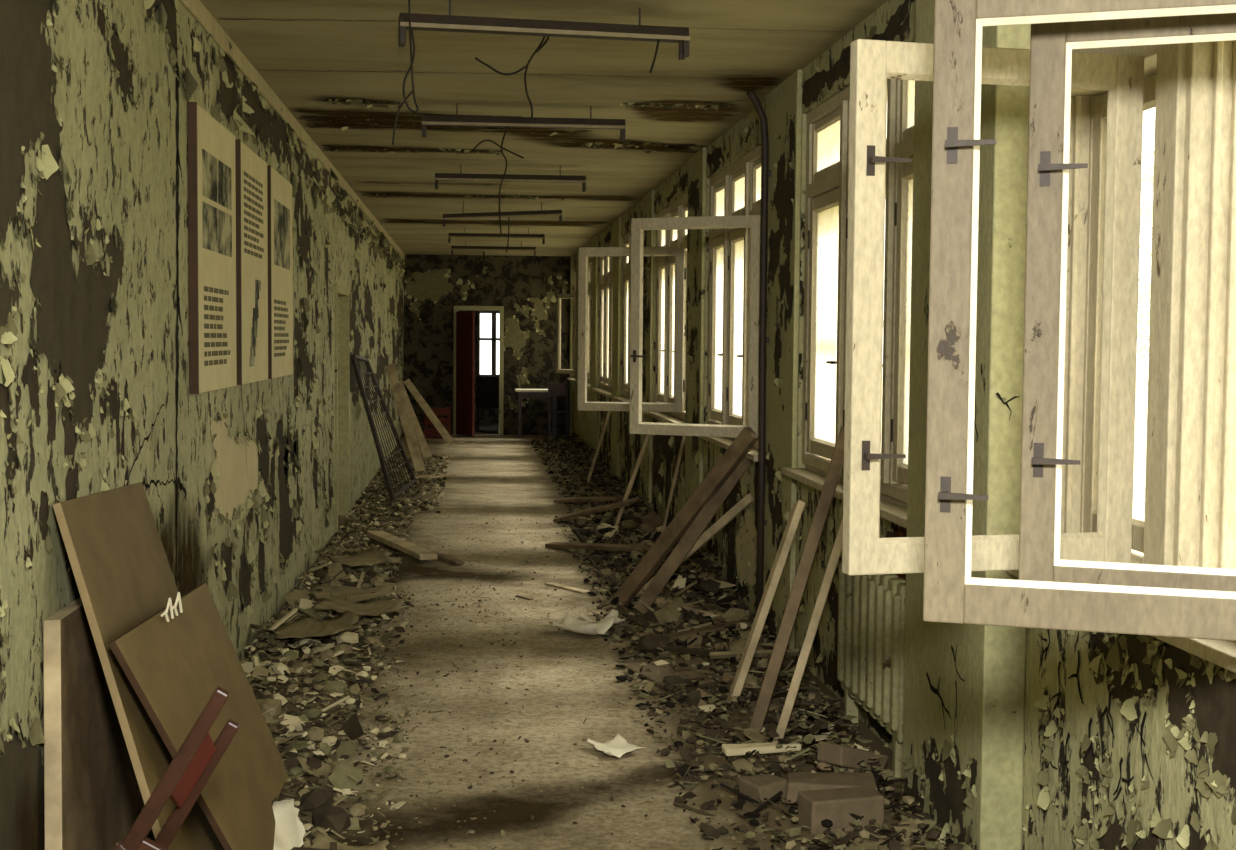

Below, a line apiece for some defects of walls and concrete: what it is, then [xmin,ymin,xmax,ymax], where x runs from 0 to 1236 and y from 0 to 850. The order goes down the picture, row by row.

peeling [868,0,915,42]
peeling [0,0,140,572]
peeling [144,0,851,619]
peeling [0,568,9,692]
peeling [0,712,45,850]
peeling [1023,686,1065,837]
peeling [1050,630,1236,824]
peeling [1074,727,1220,850]